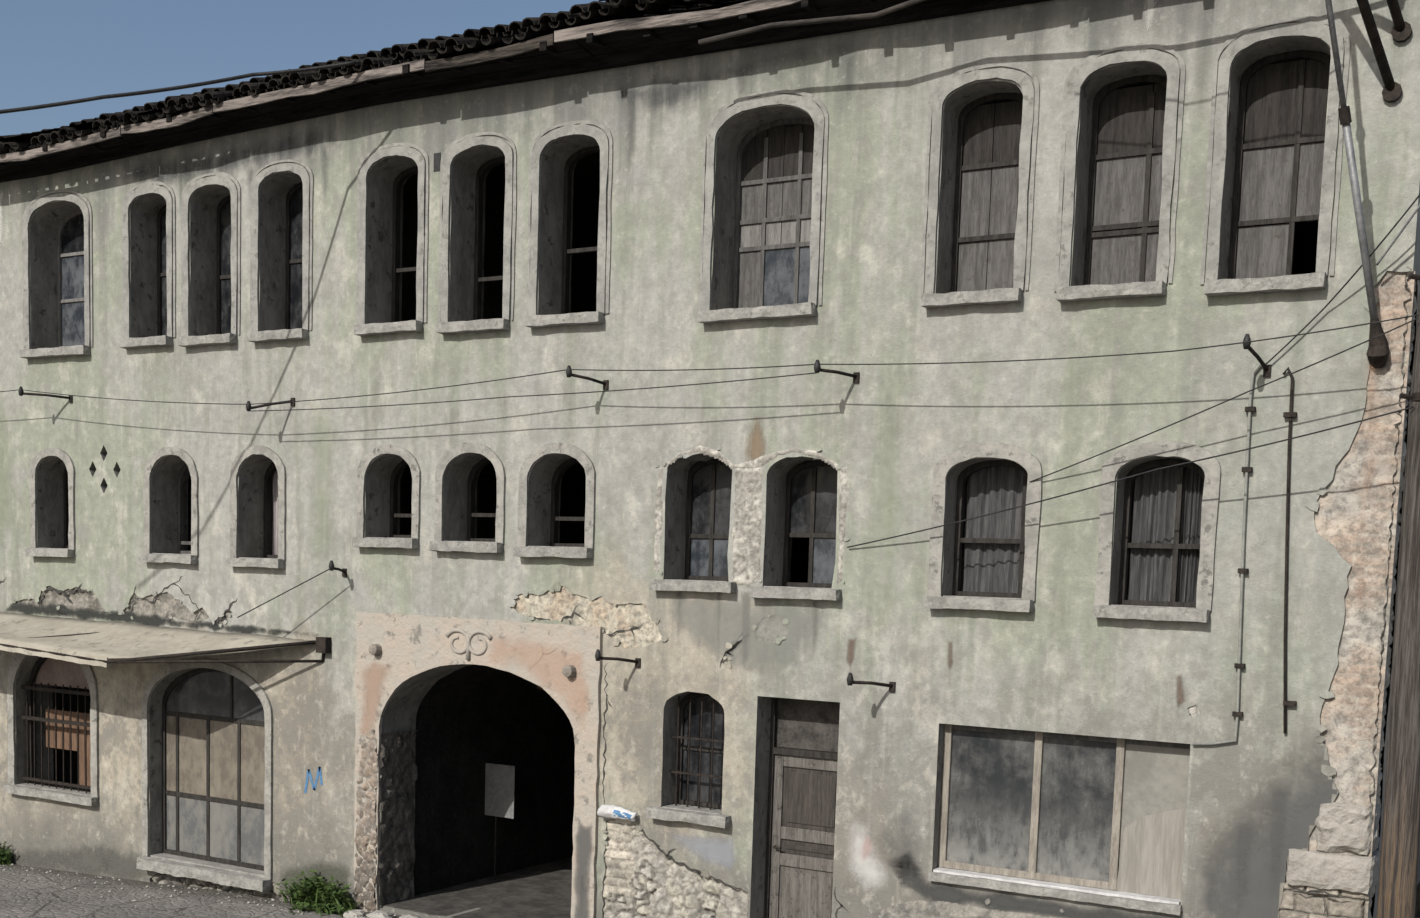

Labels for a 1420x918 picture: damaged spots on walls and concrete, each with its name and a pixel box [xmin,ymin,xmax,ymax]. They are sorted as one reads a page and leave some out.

flaking render [653,445,850,587]
flaking render [12,586,232,628]
crack [39,576,238,623]
flaking render [508,582,668,649]
spalling [1279,264,1417,918]
flaking render [601,819,748,918]
leakage [1211,759,1337,918]